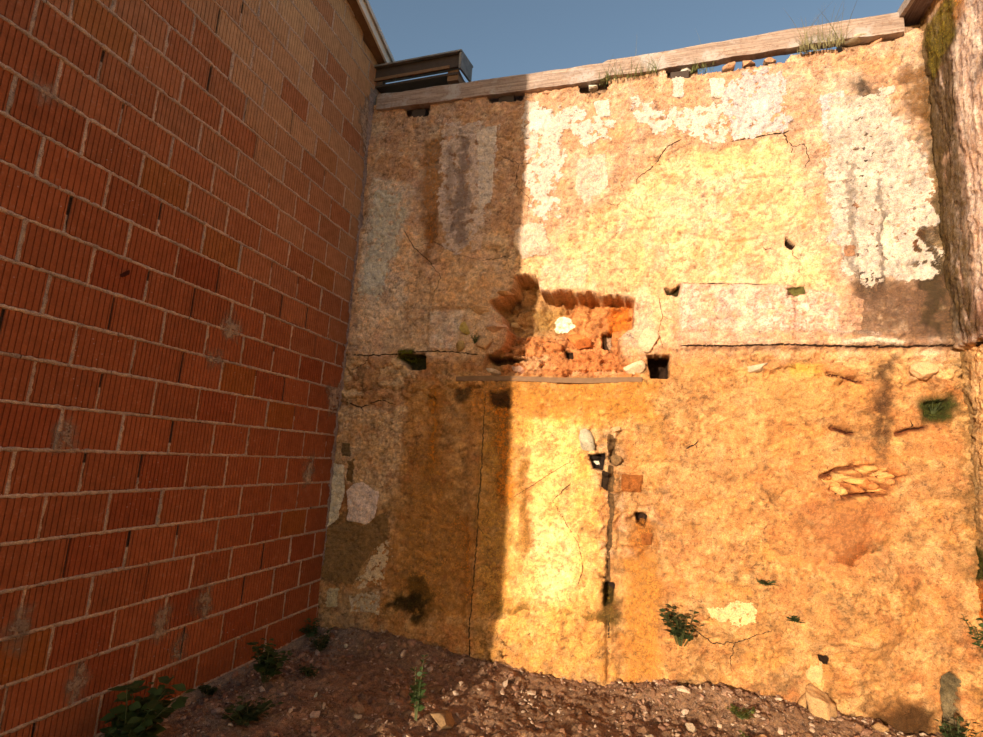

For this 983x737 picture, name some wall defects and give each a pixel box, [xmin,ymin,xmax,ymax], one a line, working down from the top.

peeling [436,120,503,255]
peeling [513,99,617,259]
spalling [613,66,803,273]
peeling [796,85,944,344]
spalling [485,273,638,377]
crack [468,394,488,656]